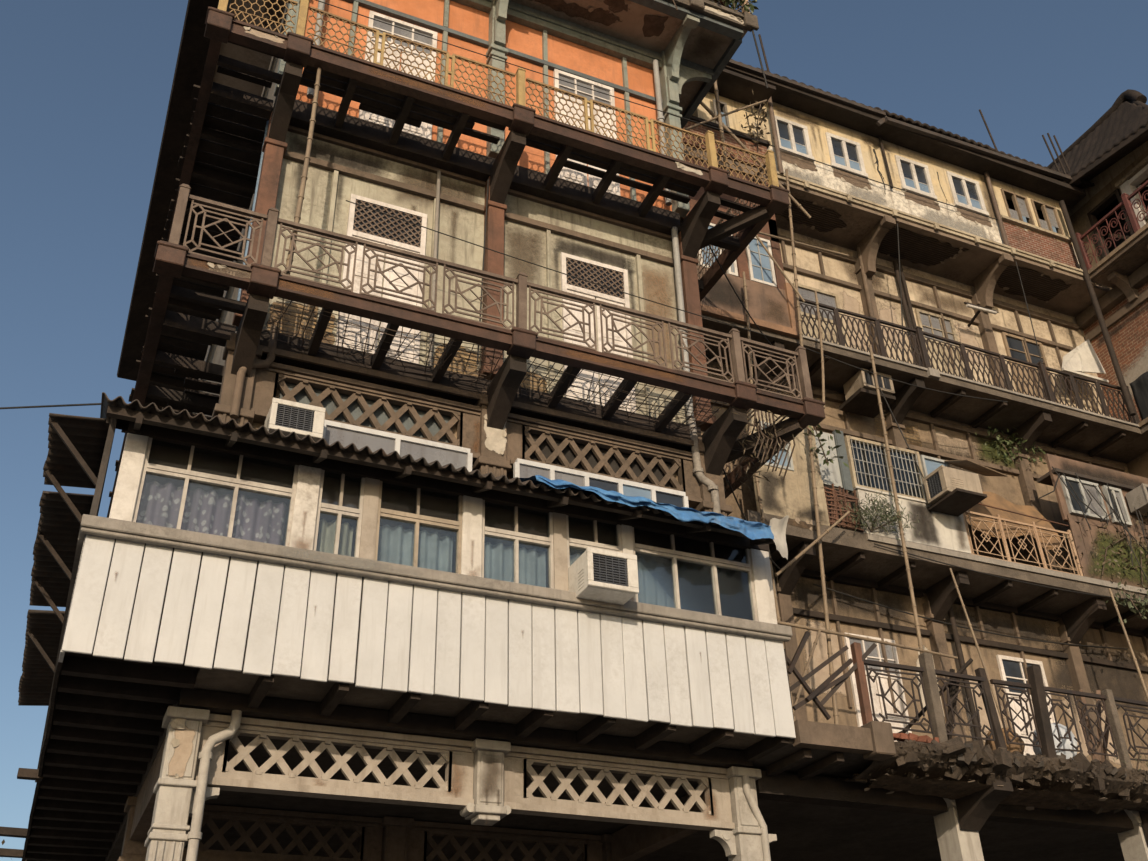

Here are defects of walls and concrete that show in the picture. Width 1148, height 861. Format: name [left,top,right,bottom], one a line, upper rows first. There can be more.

flaking render [532,0,632,26]
flaking render [642,15,668,37]
damp [982,179,997,219]
peeling [484,414,507,455]